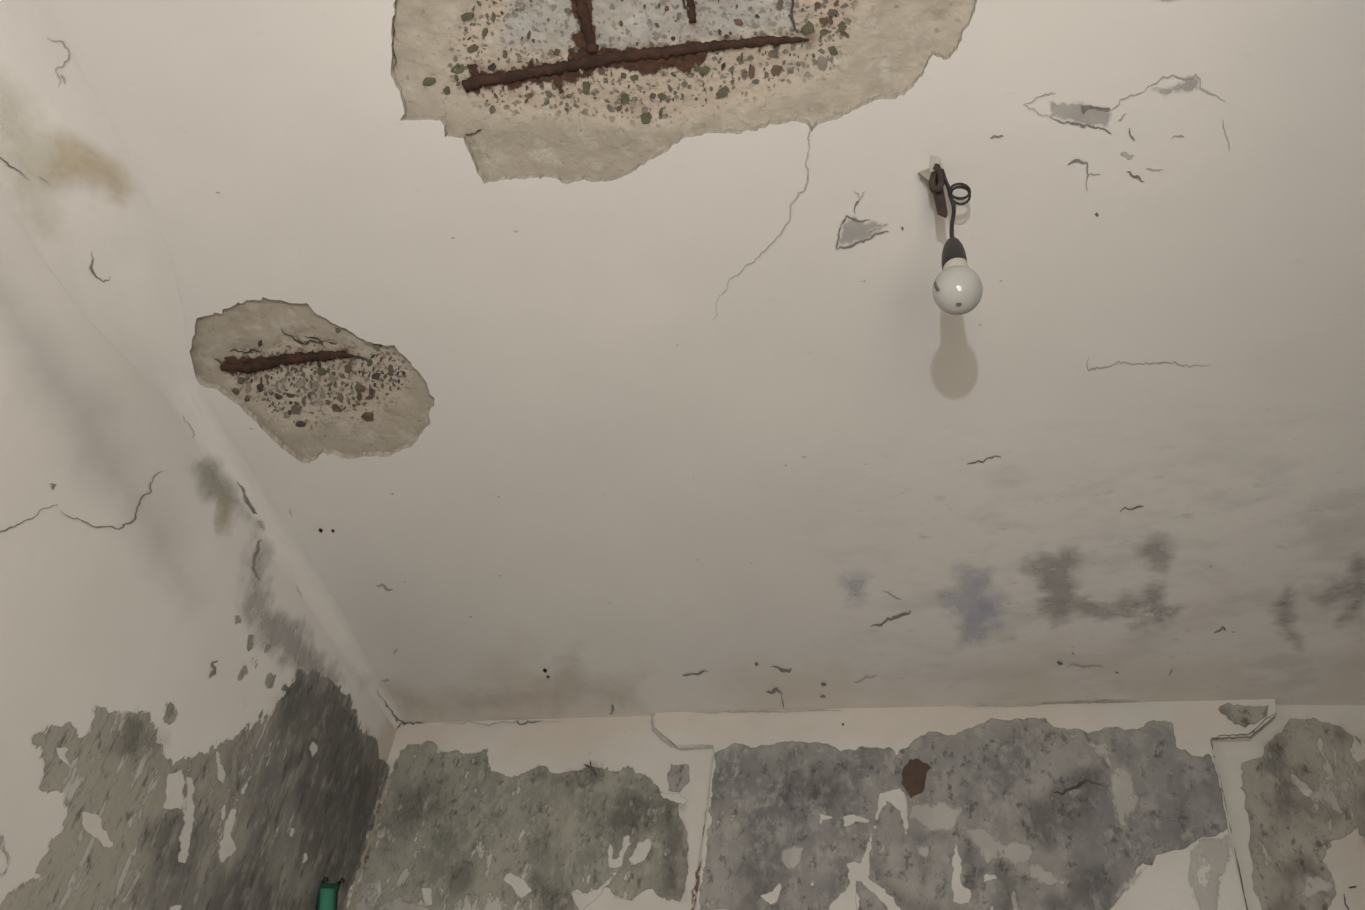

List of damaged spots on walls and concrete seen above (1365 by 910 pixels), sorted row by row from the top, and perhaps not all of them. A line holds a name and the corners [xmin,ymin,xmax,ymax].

crack [0,157,50,185]
spalling [391,0,977,184]
crack [713,128,811,320]
spalling [190,297,435,463]
crack [0,471,162,532]
peeling [0,615,1229,910]
peeling [1219,703,1268,727]
peeling [1241,718,1365,910]